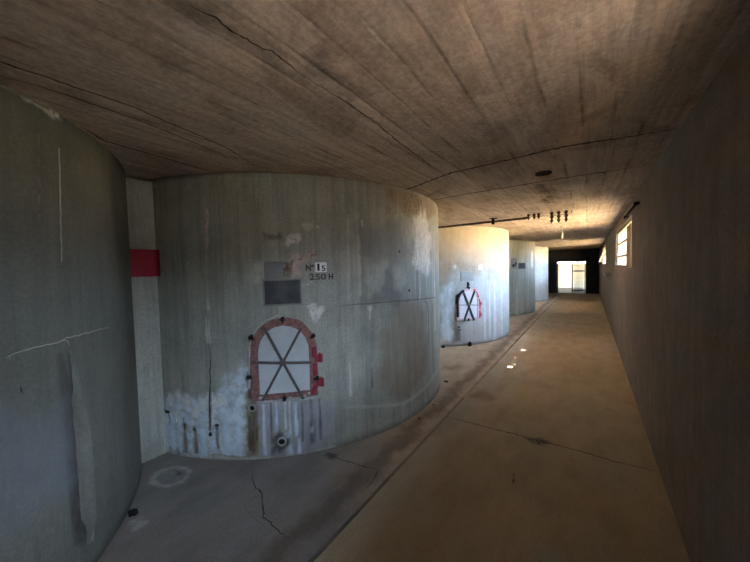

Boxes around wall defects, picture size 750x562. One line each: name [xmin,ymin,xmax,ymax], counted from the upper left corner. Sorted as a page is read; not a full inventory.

crack [190,5,677,190]
crack [6,327,109,358]
water stain [145,184,509,490]
corrosion [181,421,200,455]
crack [322,450,379,485]
crack [450,417,659,472]
crack [245,472,290,540]